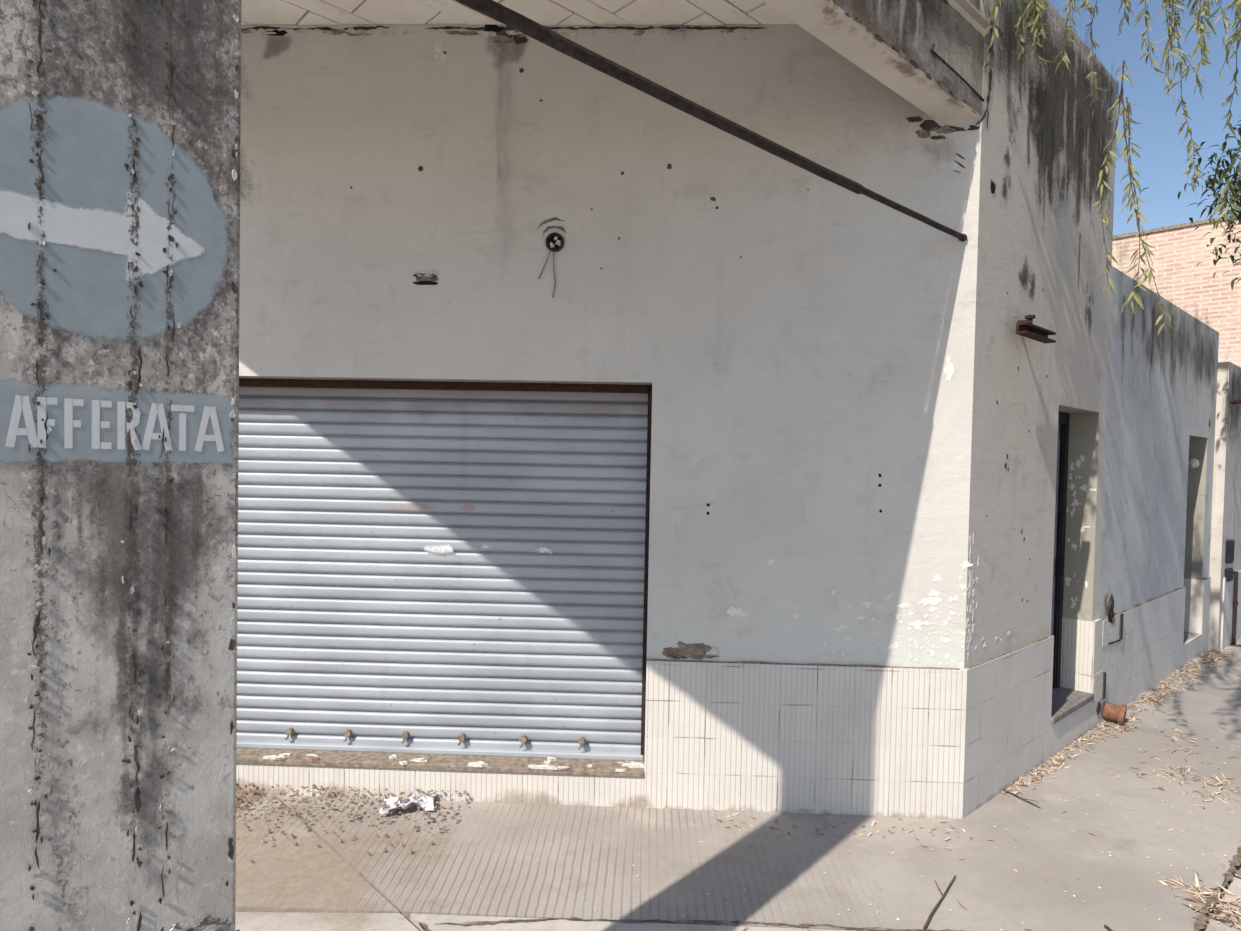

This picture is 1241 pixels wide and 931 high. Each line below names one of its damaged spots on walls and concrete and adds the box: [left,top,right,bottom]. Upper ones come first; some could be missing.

leakage [112,0,242,124]
leakage [847,0,960,52]
spalling [833,0,985,140]
leakage [232,152,252,196]
leakage [925,0,1118,286]
leakage [1122,274,1241,441]
peeling [1067,455,1097,517]
leakage [75,463,205,743]
peeling [823,533,1011,667]
peeling [1065,573,1088,608]
leakage [117,753,173,838]